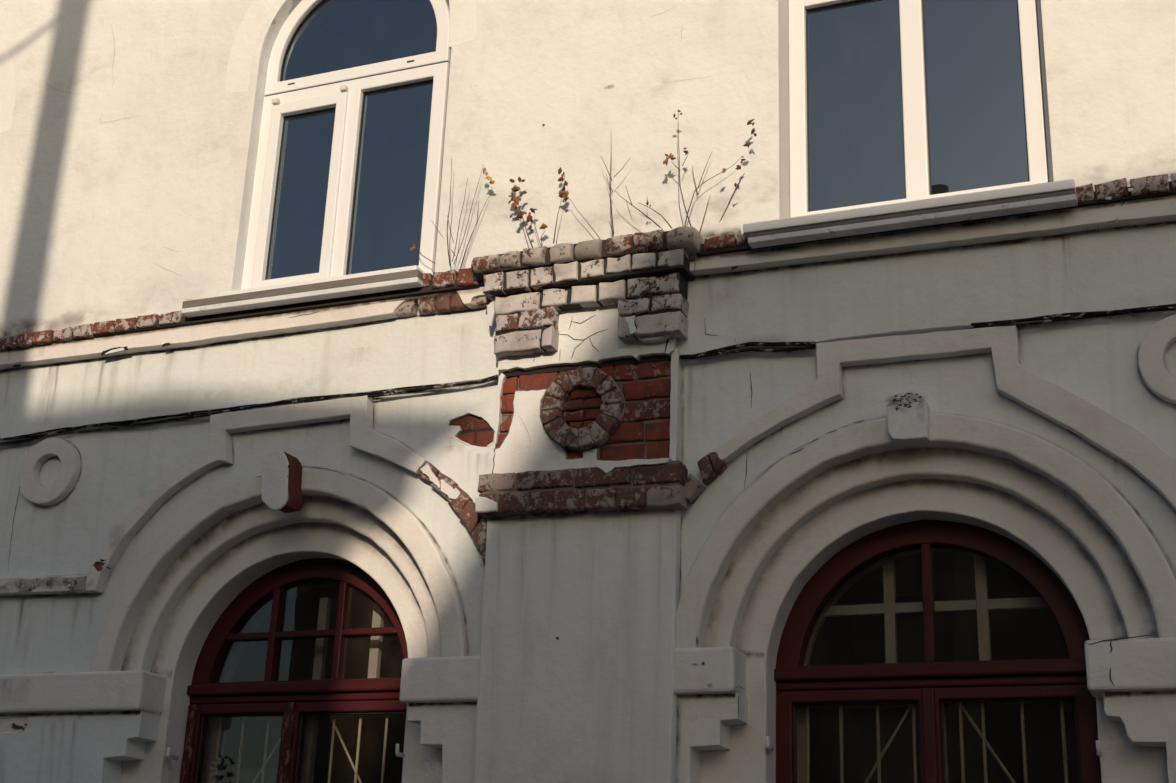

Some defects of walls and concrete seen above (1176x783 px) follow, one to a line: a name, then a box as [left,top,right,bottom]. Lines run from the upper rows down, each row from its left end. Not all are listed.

spalling [101,346,128,356]
crack [561,315,608,359]
flaking render [450,360,671,474]
flaking render [684,452,727,504]
flaking render [418,462,487,566]